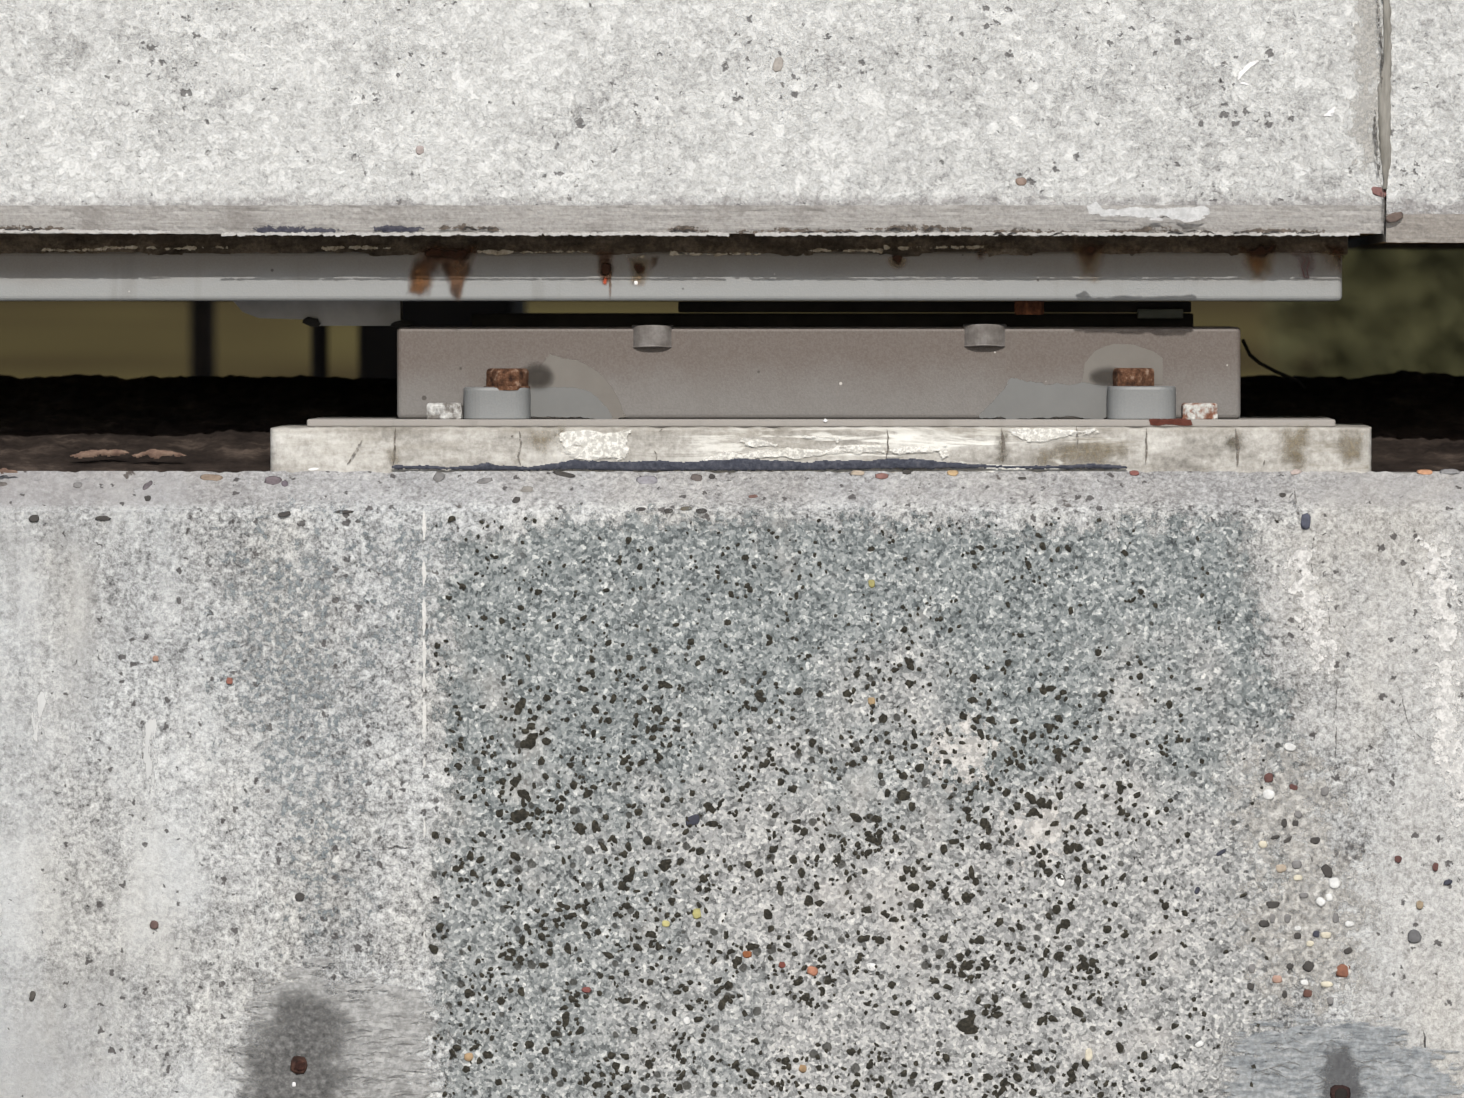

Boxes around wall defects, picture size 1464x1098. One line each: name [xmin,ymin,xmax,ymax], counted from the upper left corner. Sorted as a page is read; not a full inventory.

rust [410,246,475,299]
rust [599,252,612,292]
rust [634,258,656,285]